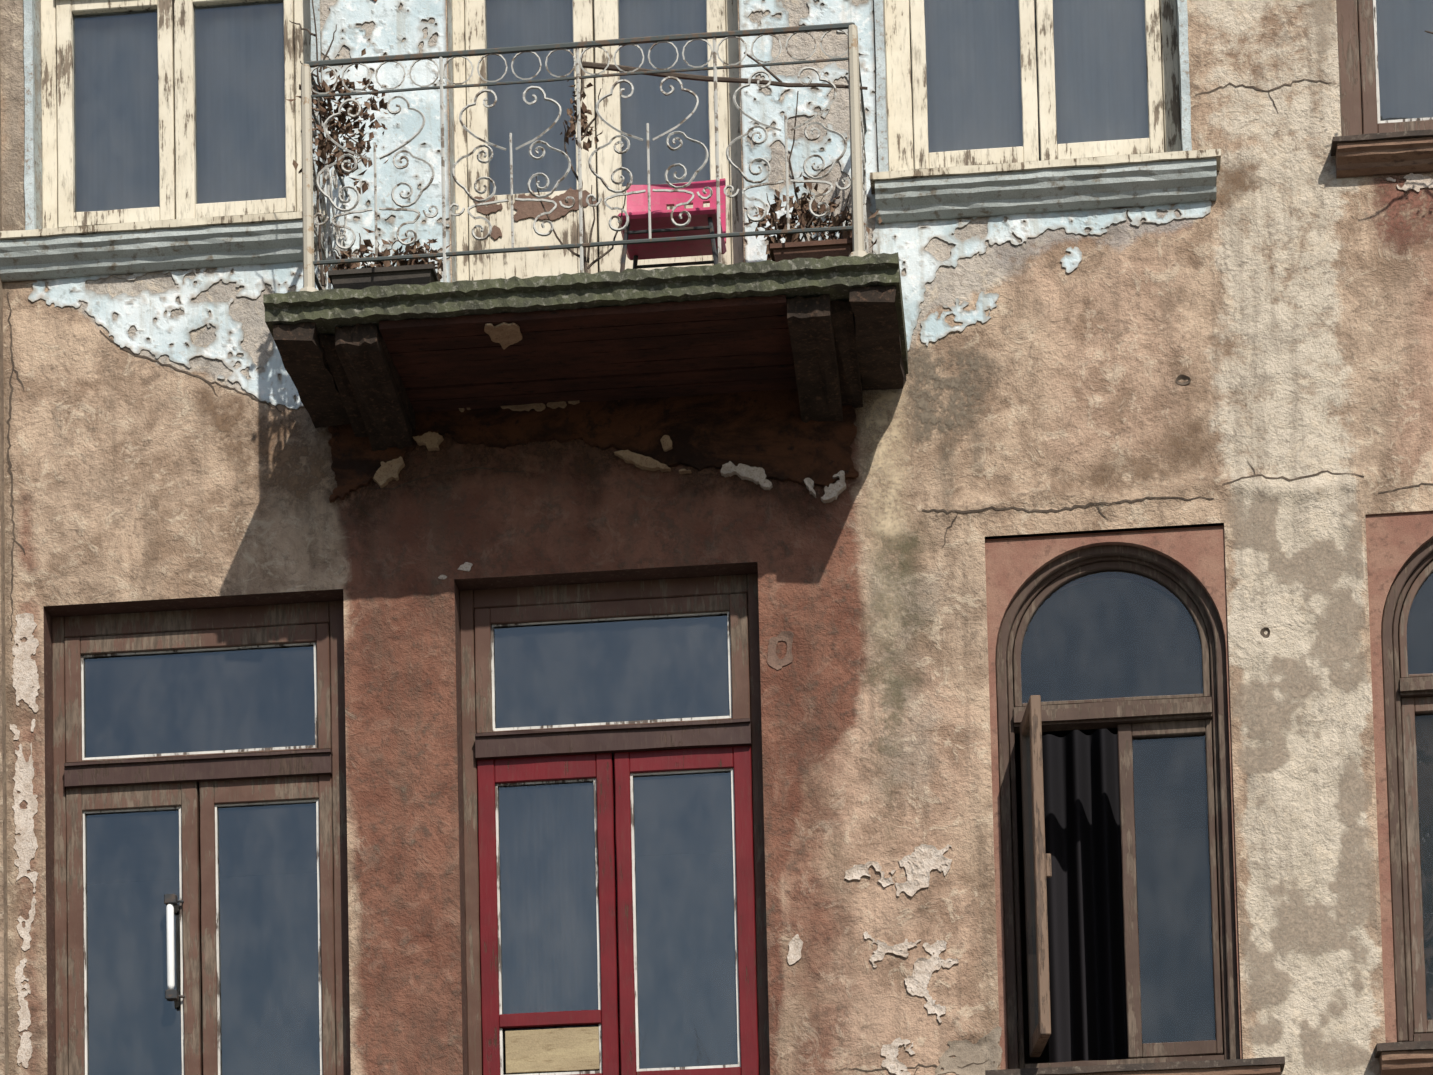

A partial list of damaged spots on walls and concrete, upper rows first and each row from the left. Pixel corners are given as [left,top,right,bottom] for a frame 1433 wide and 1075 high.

crack [1195,79,1336,112]
peeling [28,0,451,410]
peeling [474,187,597,240]
peeling [739,0,1212,351]
crack [6,292,25,640]
flaking render [721,461,773,490]
crack [922,461,1433,547]
peeling [10,613,40,1068]
flaking render [844,844,952,897]
flaking render [863,931,959,1023]
flaking render [881,1037,915,1075]
flaking render [935,1026,1003,1075]